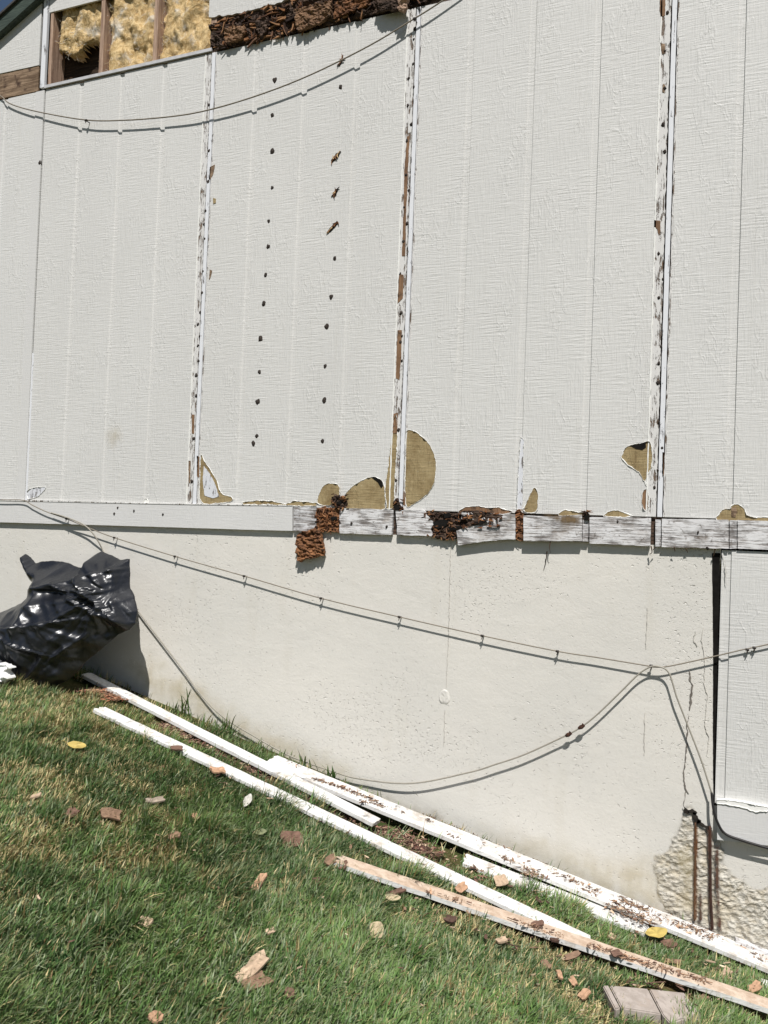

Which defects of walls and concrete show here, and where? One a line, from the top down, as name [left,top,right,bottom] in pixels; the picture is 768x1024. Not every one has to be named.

peeling [402,136,410,256]
peeling [188,413,437,510]
peeling [621,441,664,511]
peeling [716,504,768,522]
crack [683,553,726,832]
corrosion [693,827,721,931]
spalling [653,807,768,950]